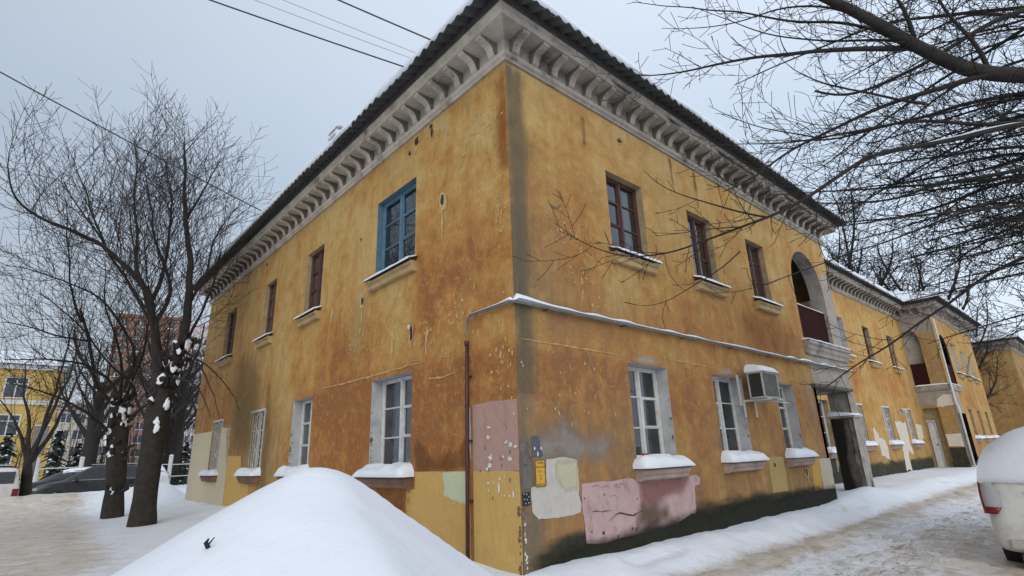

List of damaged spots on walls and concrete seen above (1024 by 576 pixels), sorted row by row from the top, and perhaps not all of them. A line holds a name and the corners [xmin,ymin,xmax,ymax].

peeling [401,293,483,355]
peeling [873,427,891,460]
peeling [895,421,924,471]
crack [593,510,642,530]
damp [639,478,686,524]